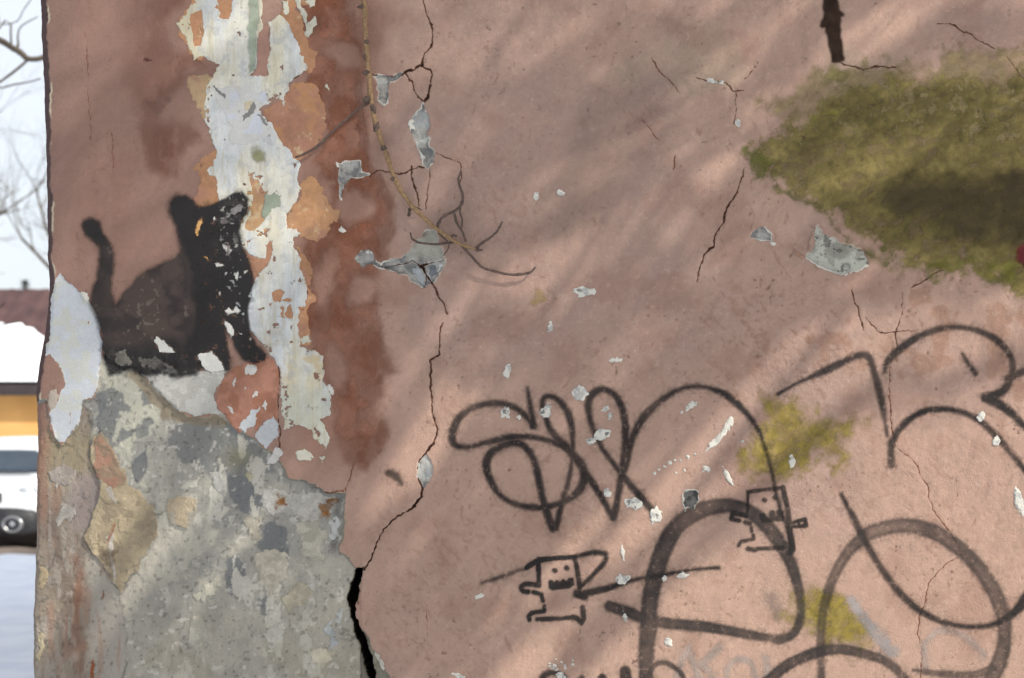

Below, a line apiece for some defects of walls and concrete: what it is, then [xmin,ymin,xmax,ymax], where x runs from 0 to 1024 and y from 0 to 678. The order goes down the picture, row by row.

crack [372,0,434,103]
crack [370,153,462,209]
crack [696,170,744,282]
flaking render [792,227,869,276]
flaking render [33,0,445,678]
crack [347,260,448,678]
crack [851,270,958,678]